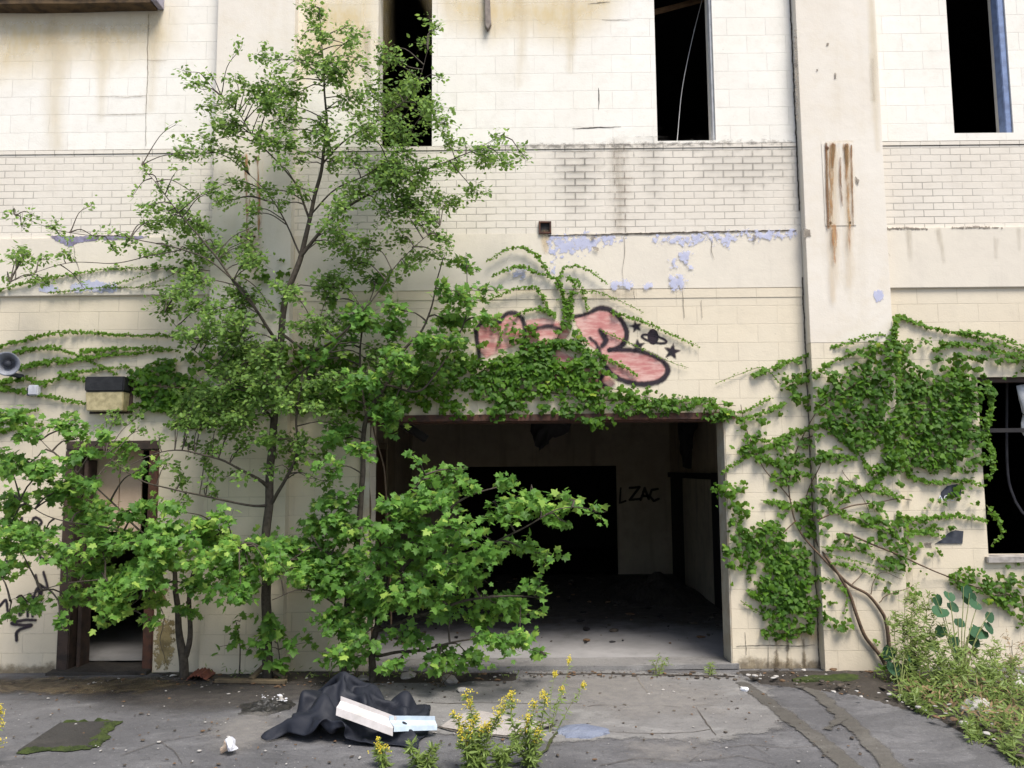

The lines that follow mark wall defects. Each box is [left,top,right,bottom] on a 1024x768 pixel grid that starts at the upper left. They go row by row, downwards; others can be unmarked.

crack [548,0,800,274]
rust [825,143,854,261]
peeling [39,279,118,293]
peeling [48,235,147,247]
peeling [547,231,626,274]
peeling [652,226,811,291]
crack [736,277,820,666]